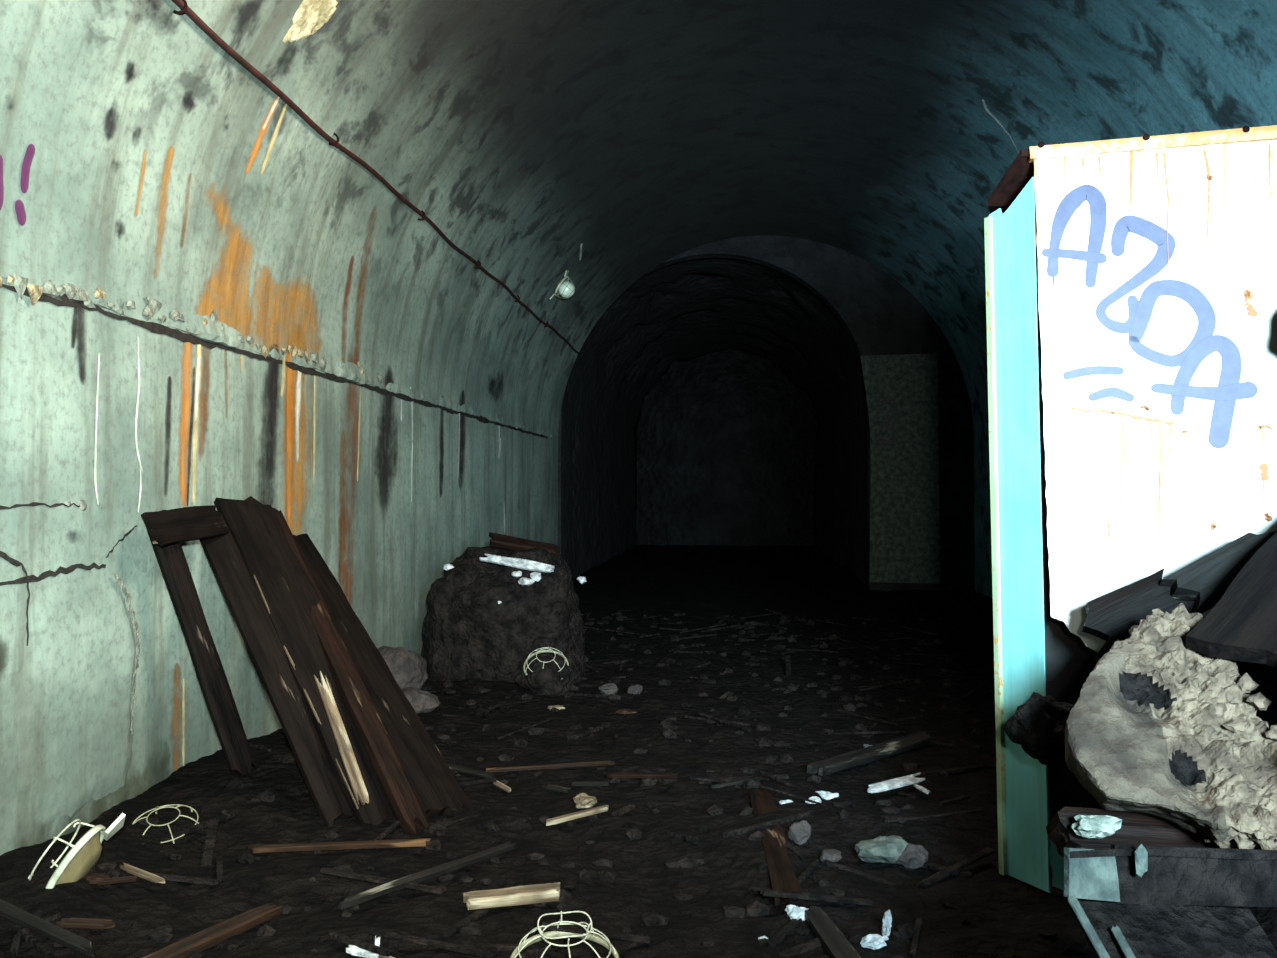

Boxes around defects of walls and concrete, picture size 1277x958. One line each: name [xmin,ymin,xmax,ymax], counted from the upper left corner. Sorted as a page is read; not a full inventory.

water stain [238,3,257,28]
spalling [283,0,338,43]
water stain [279,46,297,71]
water stain [126,63,134,81]
water stain [184,93,194,110]
water stain [105,108,115,139]
corrosion [180,332,209,506]
crack [0,502,81,510]
crack [0,525,137,646]